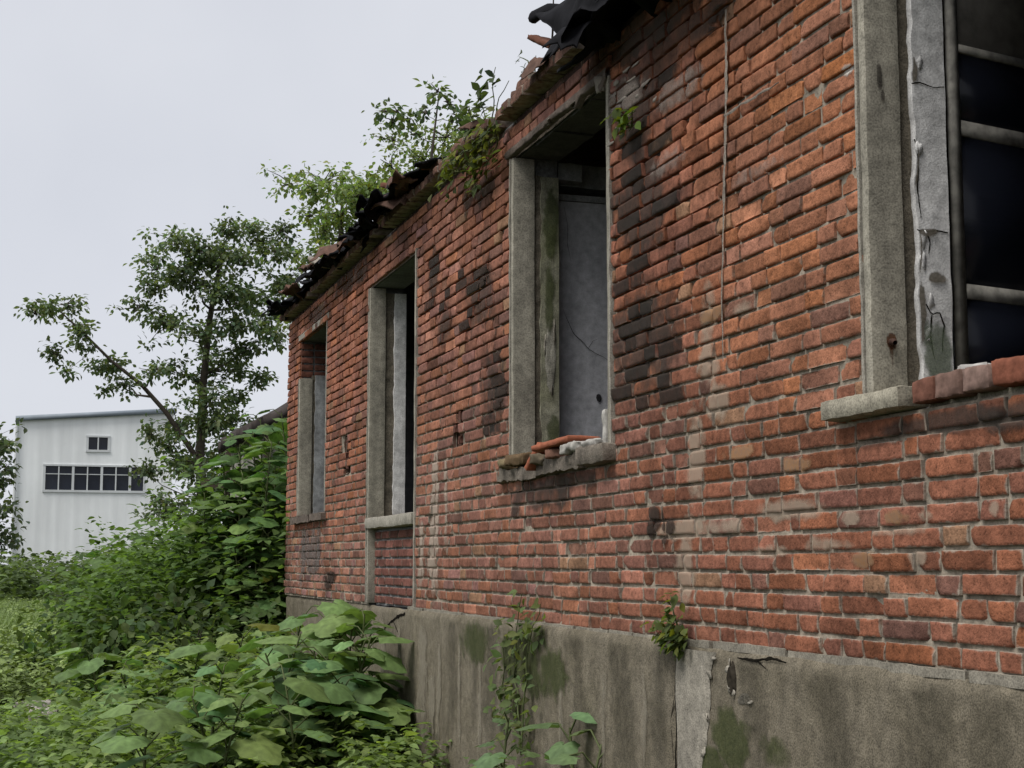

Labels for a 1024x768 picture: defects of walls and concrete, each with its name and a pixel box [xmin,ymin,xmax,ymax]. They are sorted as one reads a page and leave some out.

crack [721,9,779,359]
crack [914,139,948,254]
crack [926,304,945,331]
peeling [675,649,753,768]
crack [737,656,786,669]